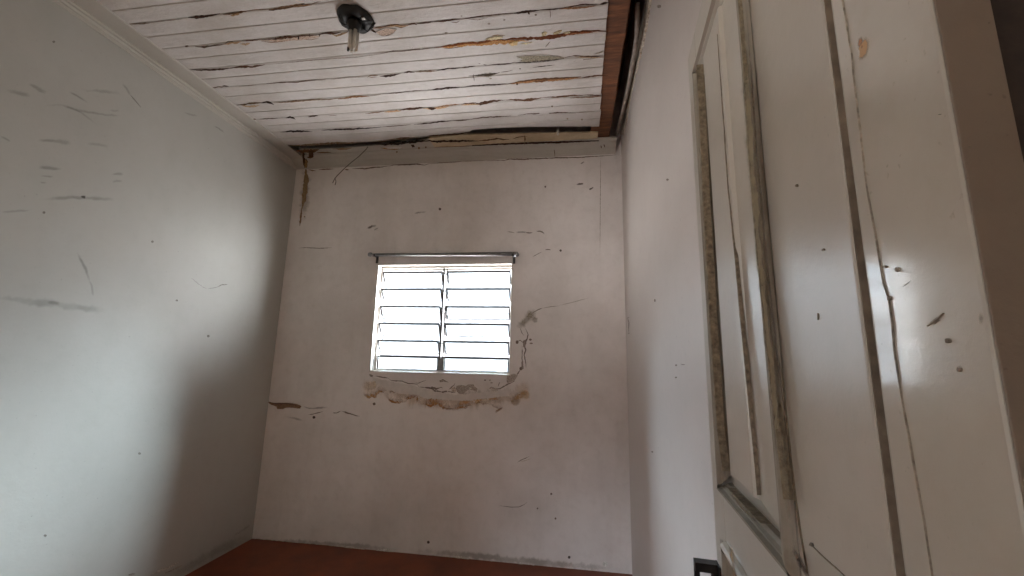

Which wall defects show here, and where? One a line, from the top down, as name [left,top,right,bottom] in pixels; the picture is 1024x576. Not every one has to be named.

peeling [185,2,608,84]
crack [841,0,933,576]
crack [489,298,587,389]
flaking render [268,401,302,410]
water stain [364,390,486,410]